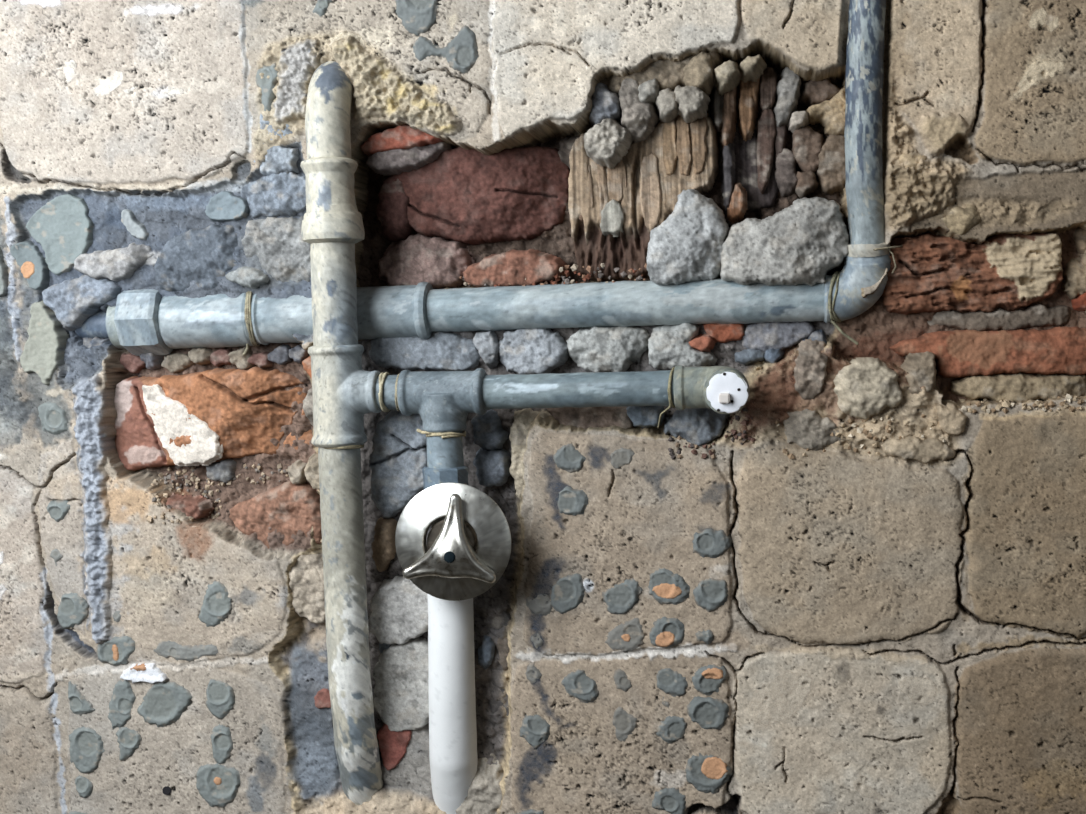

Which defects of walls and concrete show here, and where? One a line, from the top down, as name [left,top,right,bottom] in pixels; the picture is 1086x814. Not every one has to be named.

crack [499,42,592,69]
spalling [434,41,846,156]
crack [896,91,934,106]
crack [972,0,1086,172]
crack [21,151,235,196]
spalling [351,122,402,287]
spalling [702,173,848,228]
spalling [889,222,1086,330]
crack [0,454,77,581]
spalling [0,152,447,814]
spalling [463,406,685,814]
crack [706,449,1086,814]